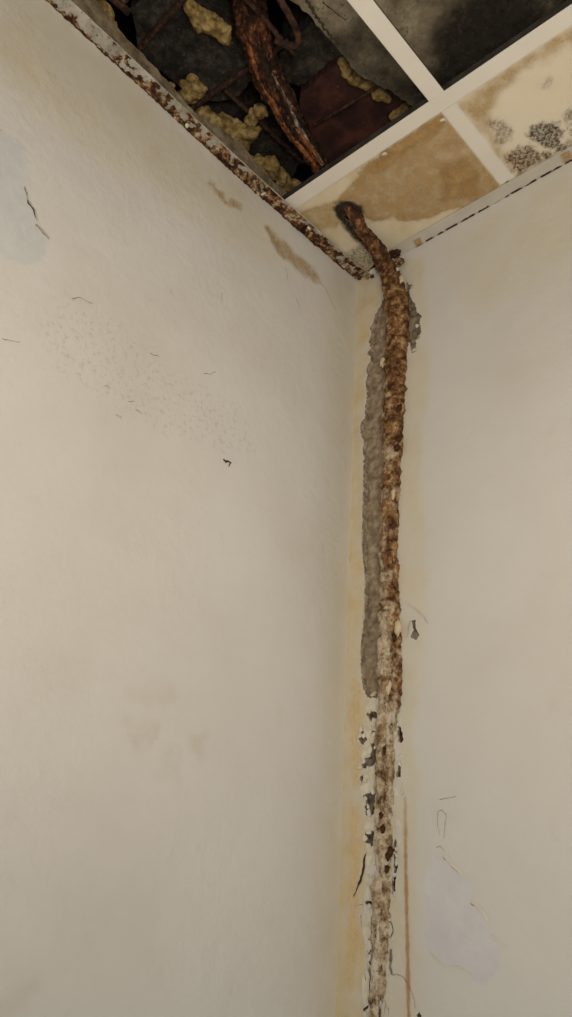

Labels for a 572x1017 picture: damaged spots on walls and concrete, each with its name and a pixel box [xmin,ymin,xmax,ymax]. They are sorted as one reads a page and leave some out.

leakage [433,0,567,87]
peeling [0,126,54,270]
rust [46,0,365,279]
leakage [305,114,509,267]
leakage [497,124,571,174]
flaking render [396,267,422,352]
leakage [0,0,384,1017]
flaking render [392,603,428,642]
leakage [381,161,572,1017]
peeling [357,697,404,1017]
peeling [422,852,507,991]